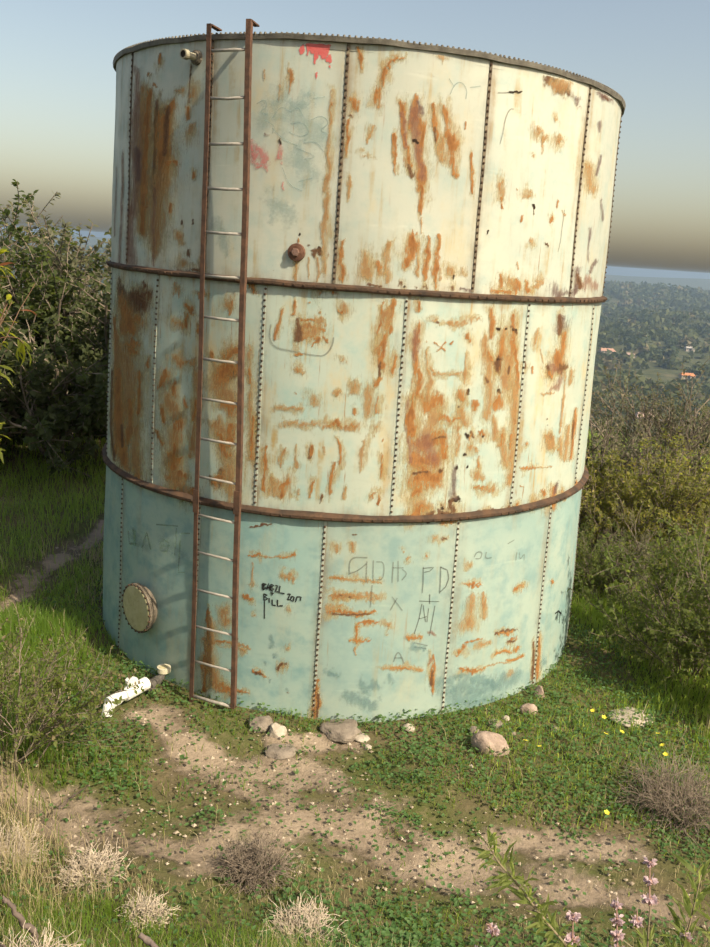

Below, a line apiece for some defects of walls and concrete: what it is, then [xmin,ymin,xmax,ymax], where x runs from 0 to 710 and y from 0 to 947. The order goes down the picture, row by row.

rust [114,65,196,266]
rust [320,89,346,282]
rust [374,55,405,108]
rust [359,94,474,292]
rust [490,231,598,297]
rust [110,276,153,479]
rust [155,354,198,495]
rust [209,298,397,503]
rust [405,301,577,525]
rust [200,606,251,696]
rust [325,576,391,655]
rust [456,581,541,679]